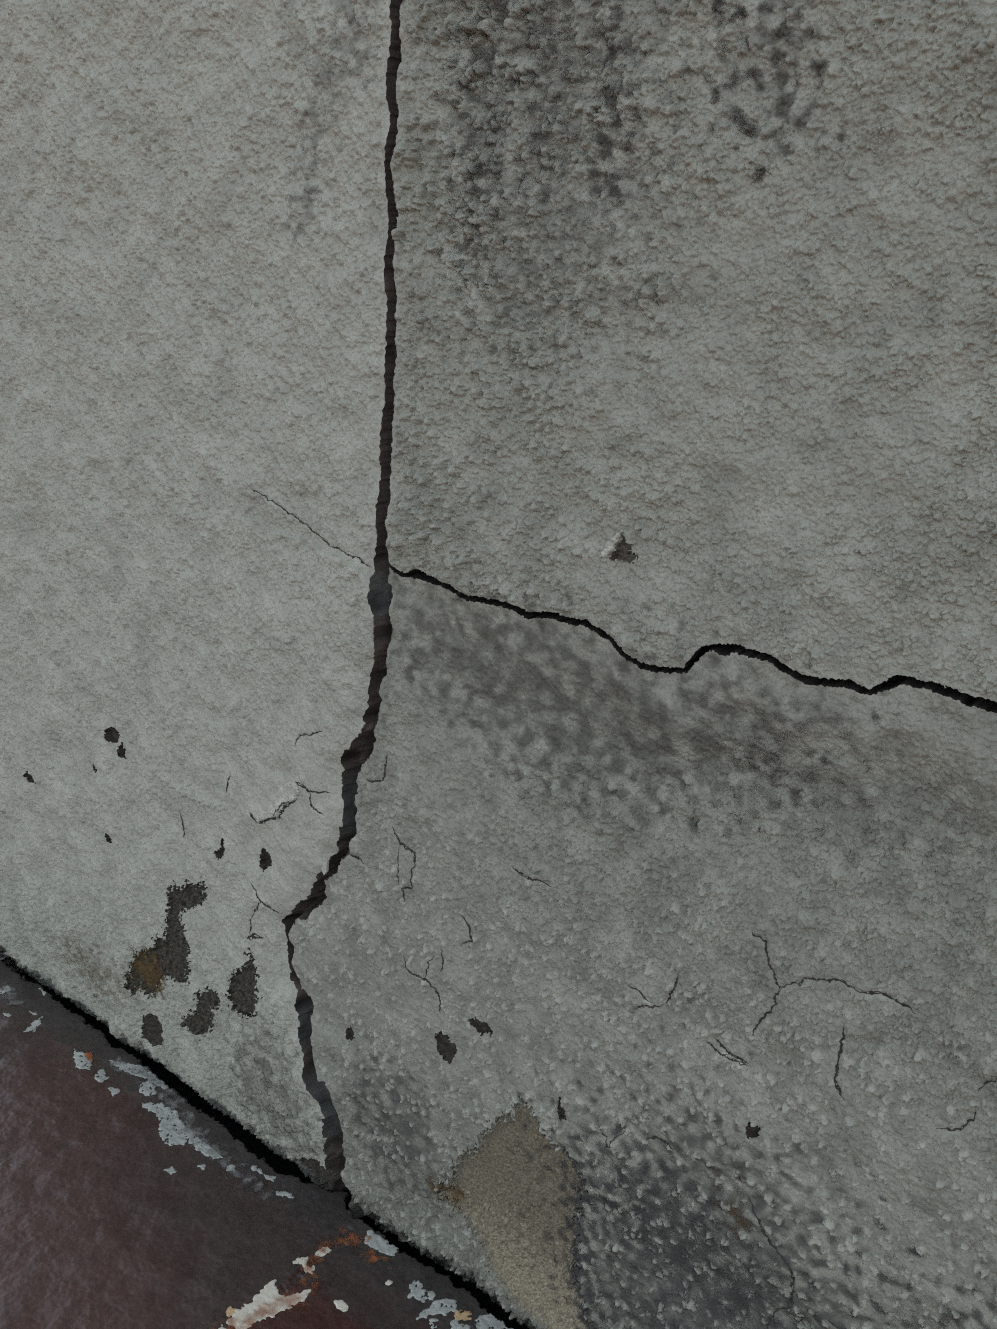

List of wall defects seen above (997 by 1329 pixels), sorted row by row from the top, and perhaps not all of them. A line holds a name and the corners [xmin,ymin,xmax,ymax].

crack [226,0,997,1203]
spalling [123,877,263,1047]
peeling [407,1280,513,1329]
spalling [433,1095,596,1329]